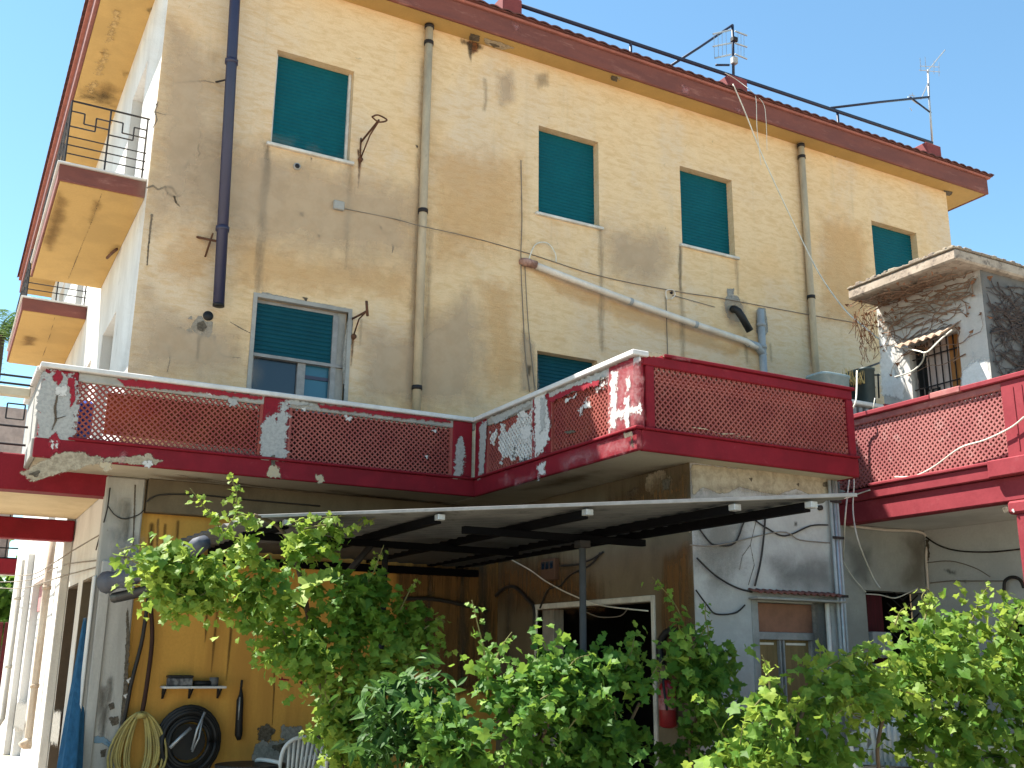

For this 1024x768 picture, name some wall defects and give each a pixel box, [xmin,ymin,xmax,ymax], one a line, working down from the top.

rust [463,40,481,55]
crack [146,144,201,265]
flaking render [186,311,216,338]
peeling [20,368,163,482]
peeling [118,378,263,407]
peeling [259,399,451,478]
peeling [452,338,664,481]